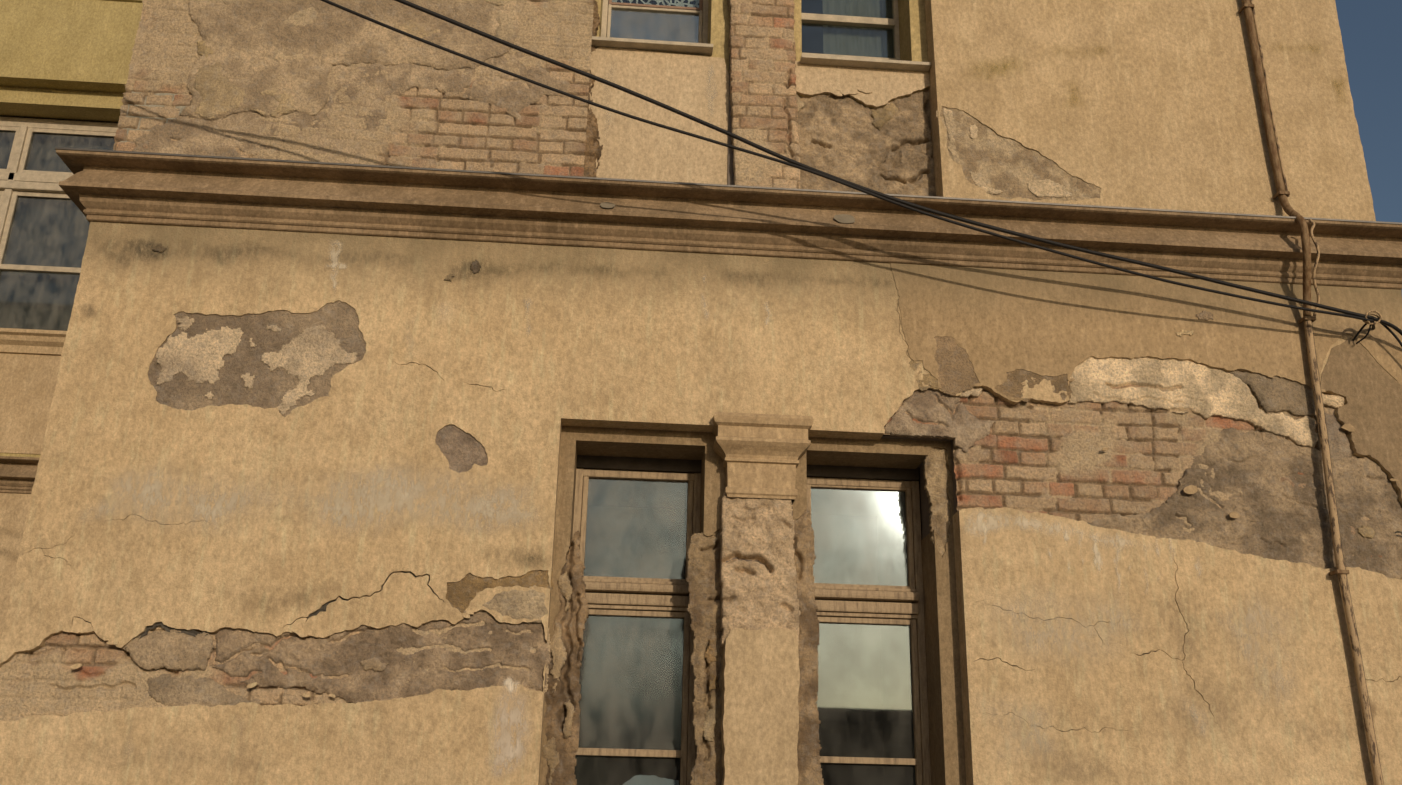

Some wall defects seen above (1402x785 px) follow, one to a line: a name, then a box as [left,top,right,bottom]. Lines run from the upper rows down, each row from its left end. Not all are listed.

flaking render [113,0,603,177]
flaking render [727,0,1101,201]
peeling [148,301,367,417]
peeling [435,425,488,473]
flaking render [884,336,1402,579]
flaking render [0,531,589,785]
crack [302,571,444,618]
flaking render [685,493,824,785]